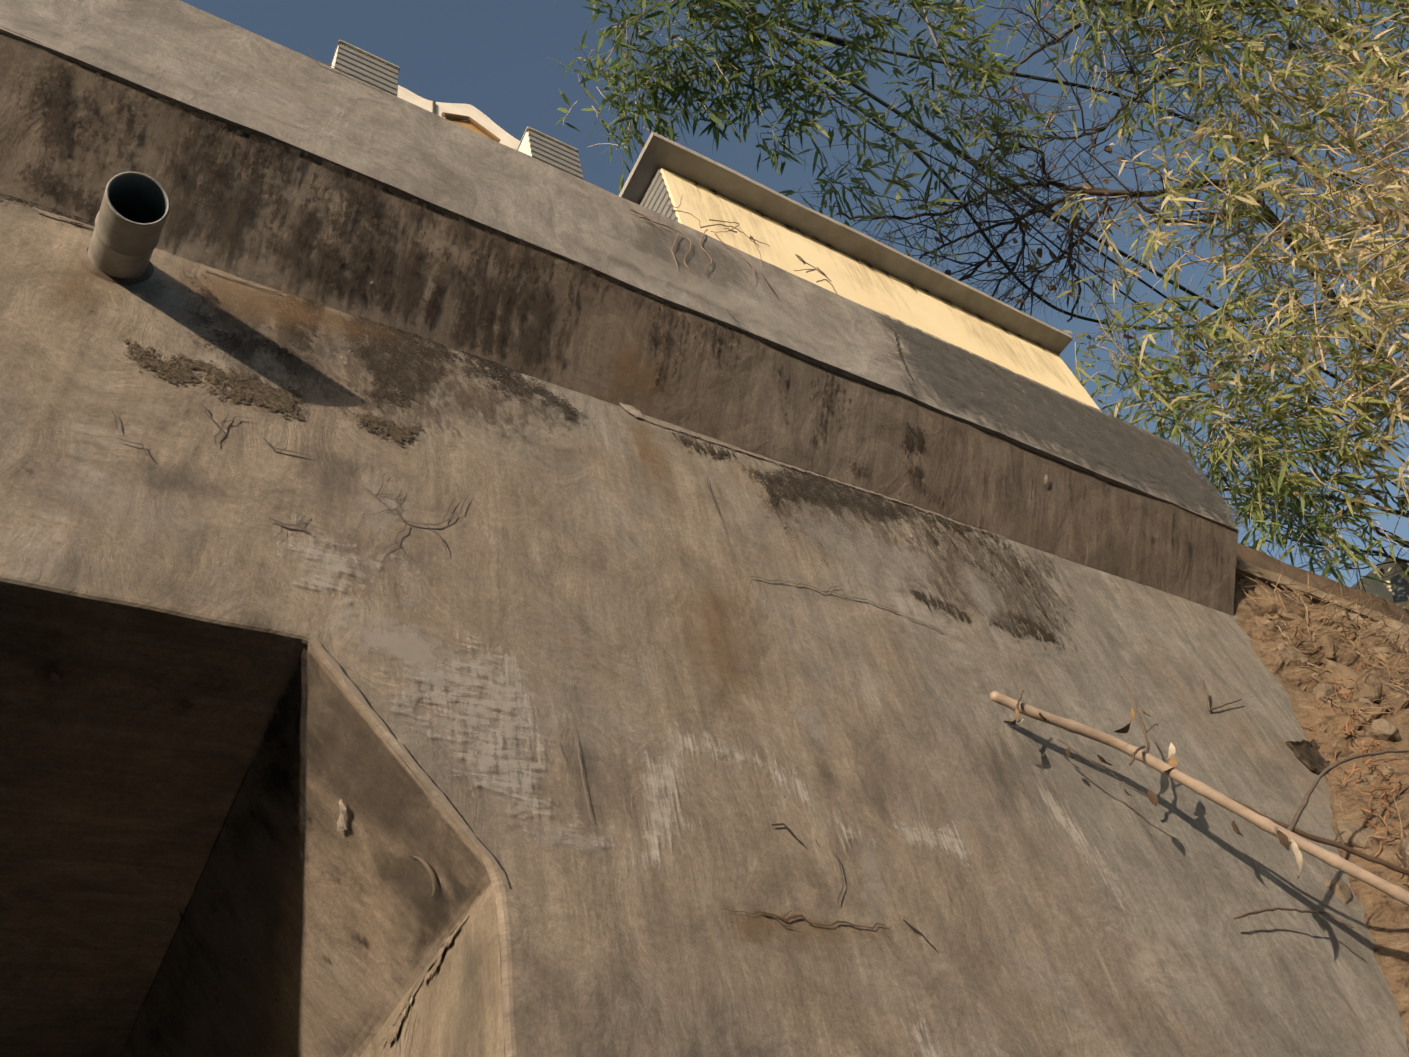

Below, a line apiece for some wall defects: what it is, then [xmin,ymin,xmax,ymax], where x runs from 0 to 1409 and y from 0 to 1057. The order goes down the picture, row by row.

damp [0,59,616,434]
damp [908,283,1046,351]
crack [361,473,470,558]
damp [672,363,1076,650]
crack [725,823,936,950]